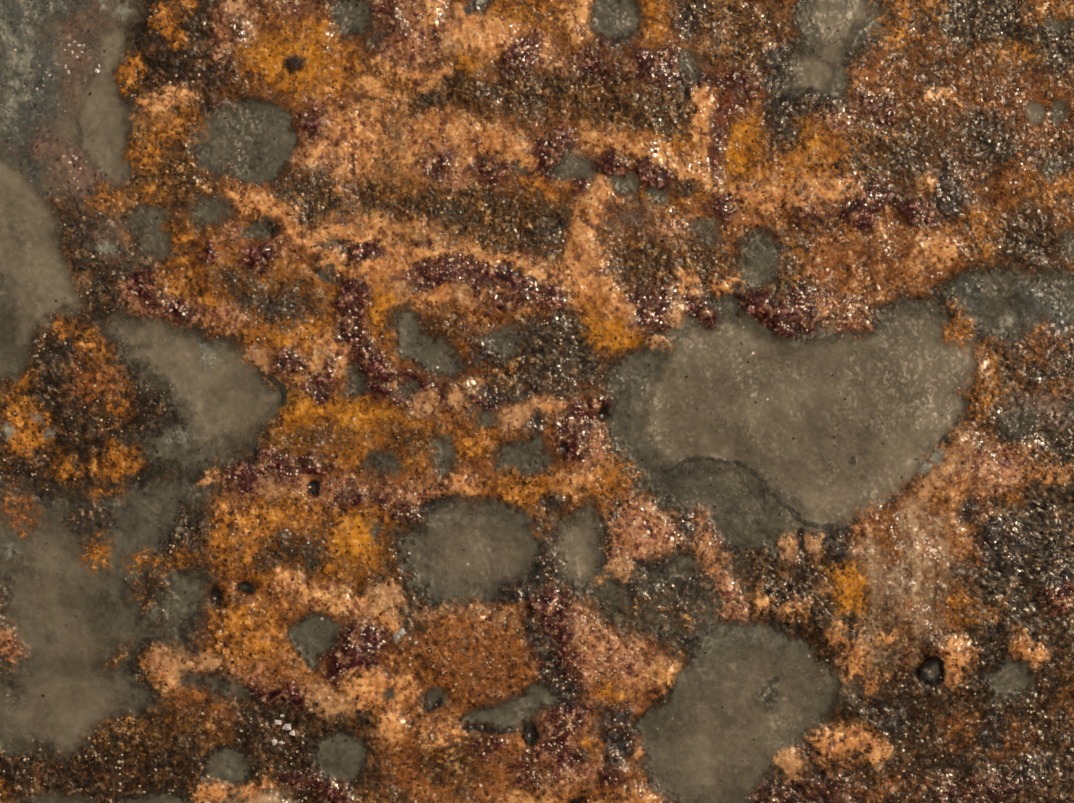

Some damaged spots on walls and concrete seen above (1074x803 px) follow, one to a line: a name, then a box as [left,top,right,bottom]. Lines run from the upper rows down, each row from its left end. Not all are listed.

rust [84,183,122,214]
rust [112,0,1074,540]
rust [0,295,185,499]
crack [663,422,965,539]
rust [0,480,671,803]
rust [743,551,874,660]
rust [935,589,1002,686]
rust [1009,628,1050,669]
rust [941,710,978,752]
rust [992,723,1035,756]